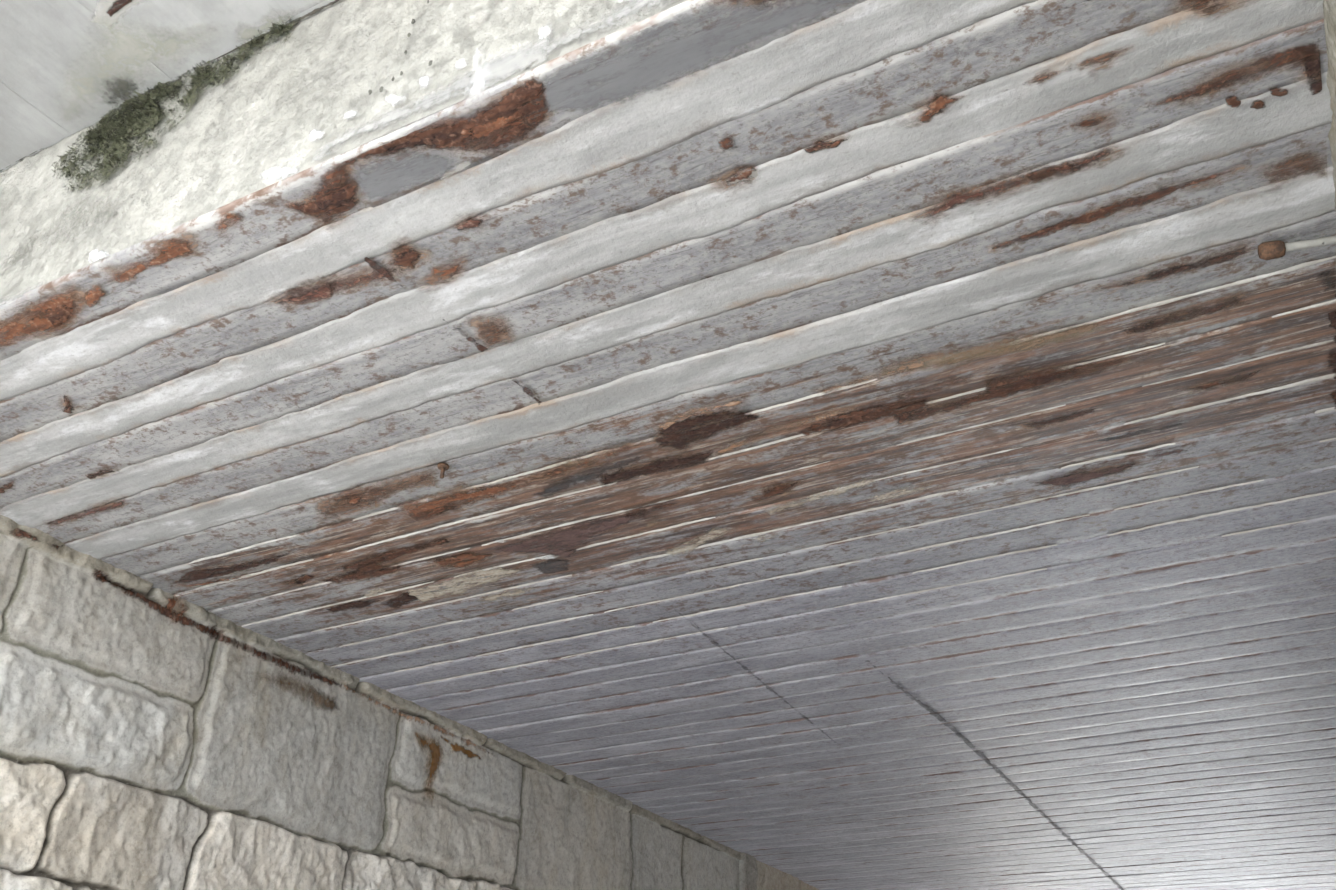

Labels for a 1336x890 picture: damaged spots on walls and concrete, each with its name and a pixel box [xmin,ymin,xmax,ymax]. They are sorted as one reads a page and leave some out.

peeling [541,0,856,112]
rust [1155,44,1322,109]
rust [916,95,958,125]
rust [804,136,846,153]
crack [364,257,403,287]
crack [443,319,487,352]
crack [514,381,542,405]
rust [317,324,1135,520]
rust [284,538,493,585]
rust [92,555,489,795]
crack [693,625,823,732]
crack [867,660,1124,890]